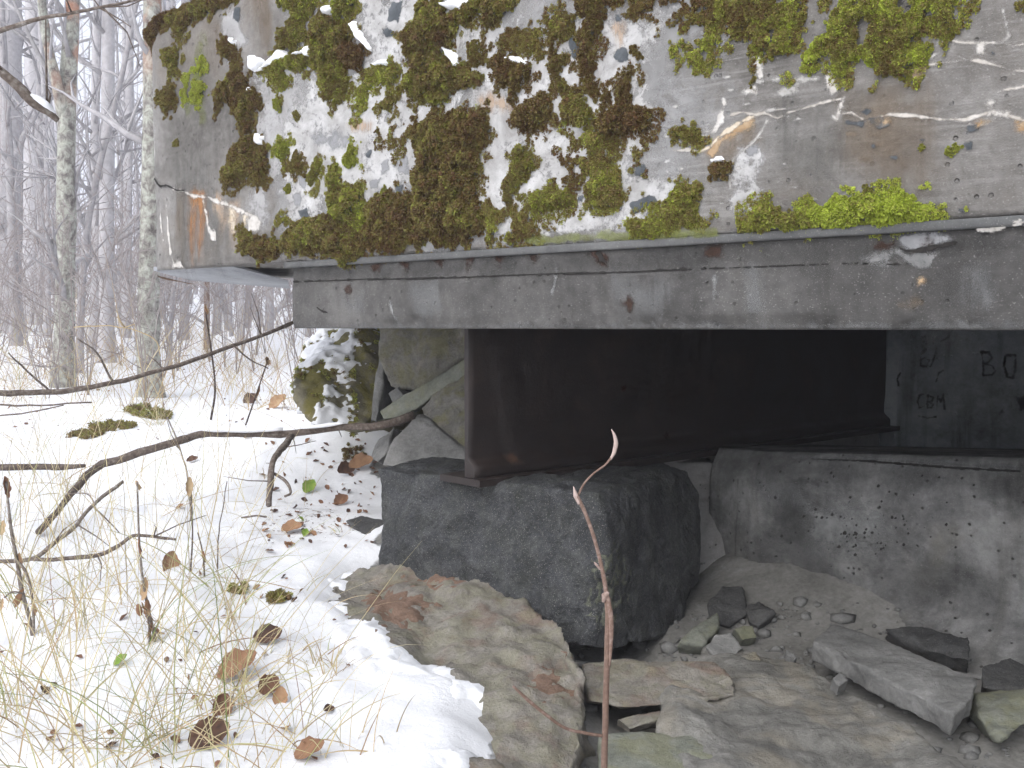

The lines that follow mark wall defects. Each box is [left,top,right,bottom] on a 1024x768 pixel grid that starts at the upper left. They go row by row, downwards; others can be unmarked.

crack [154,178,184,191]
crack [673,9,1024,186]